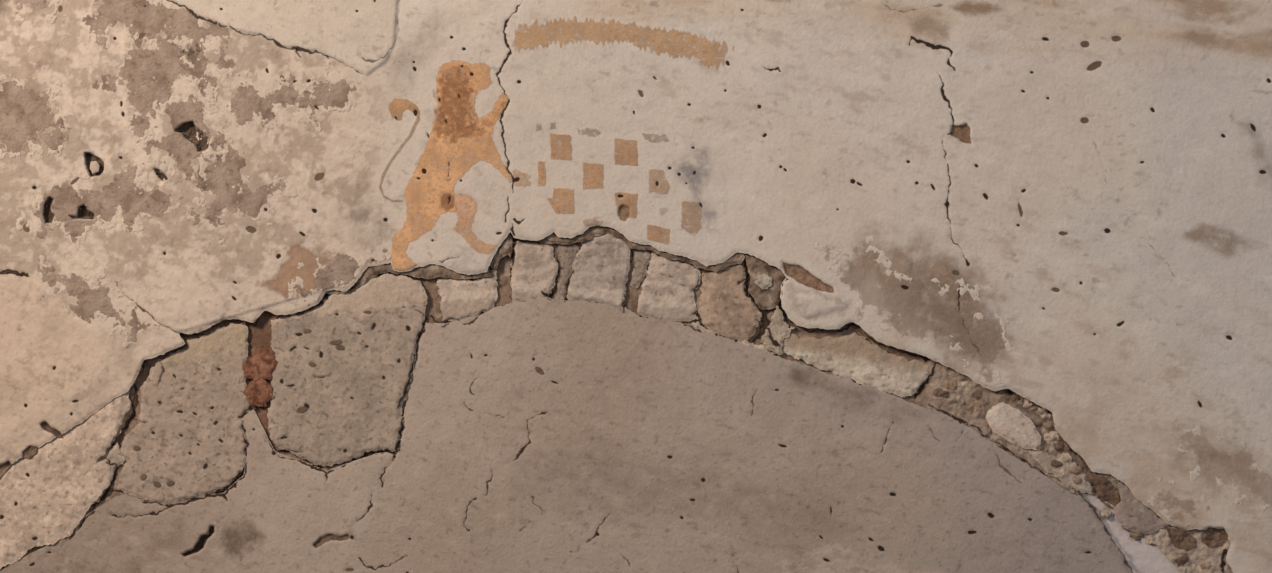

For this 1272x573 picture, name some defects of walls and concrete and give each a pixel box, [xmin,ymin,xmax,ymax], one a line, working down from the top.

crack [909,36,970,309]
crack [69,0,574,540]
spalling [539,194,859,319]
peeling [866,235,912,289]
leakage [855,248,991,345]
peeling [931,270,1015,352]
spalling [289,329,344,378]
spalling [0,461,11,478]
spalling [22,445,38,477]
spalling [313,534,353,548]
crack [358,555,407,570]